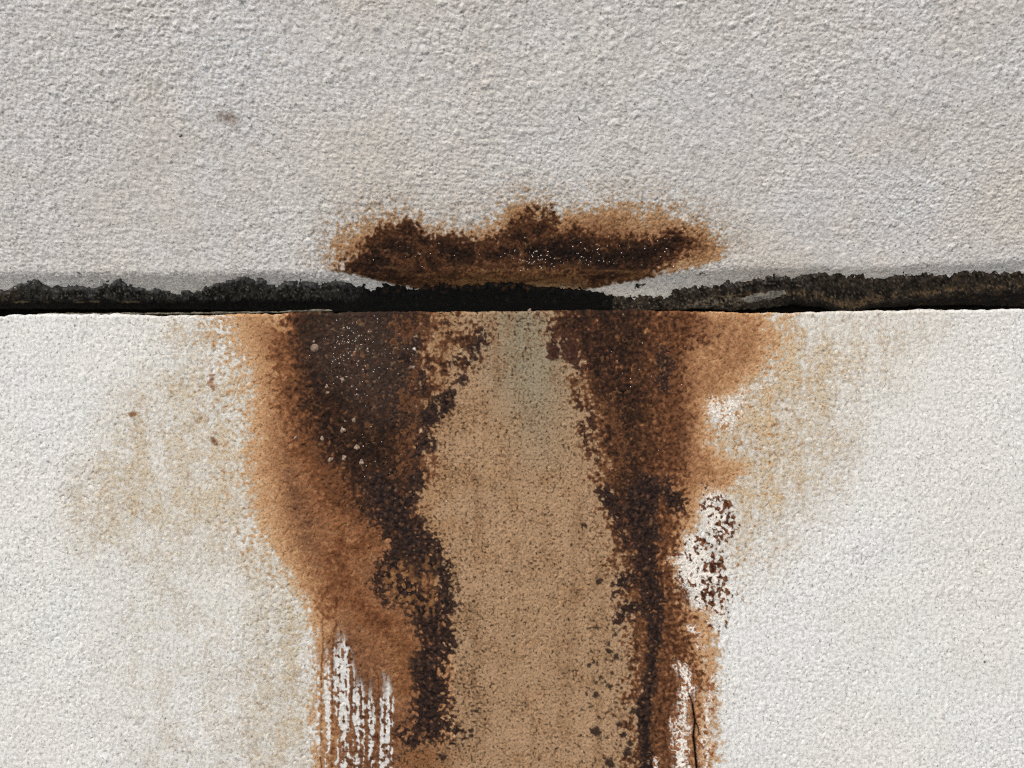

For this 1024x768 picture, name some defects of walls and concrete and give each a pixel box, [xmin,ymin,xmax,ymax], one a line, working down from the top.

corrosion [318,187,730,290]
corrosion [202,308,806,768]
peeling [674,488,734,631]